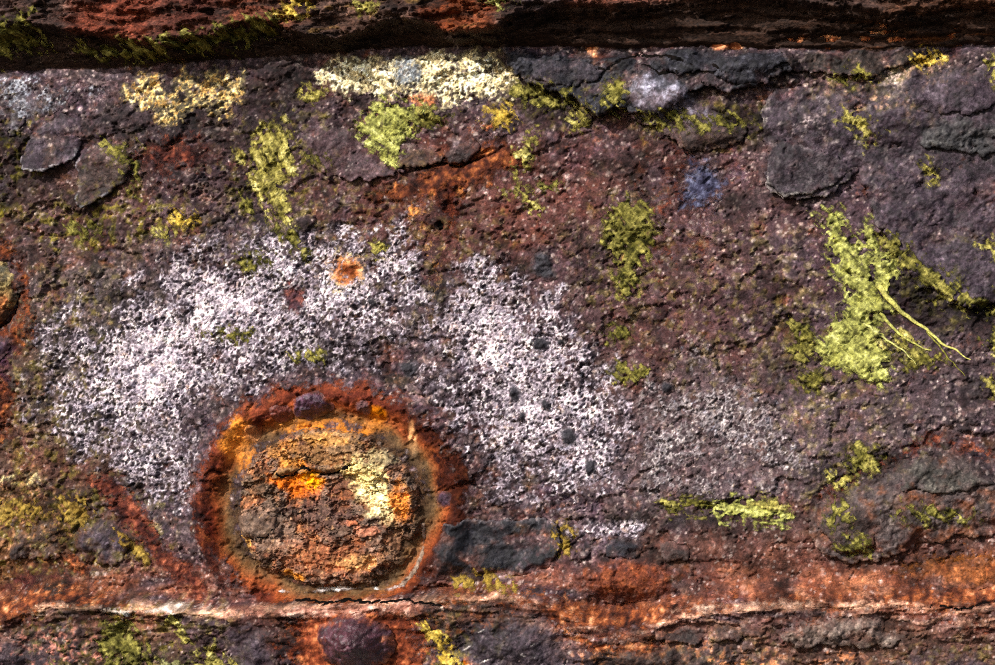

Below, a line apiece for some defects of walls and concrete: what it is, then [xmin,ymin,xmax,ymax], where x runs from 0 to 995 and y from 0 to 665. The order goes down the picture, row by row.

rust [85,374,487,665]
crack [287,598,442,607]
rust [499,590,743,655]
rust [784,581,995,634]